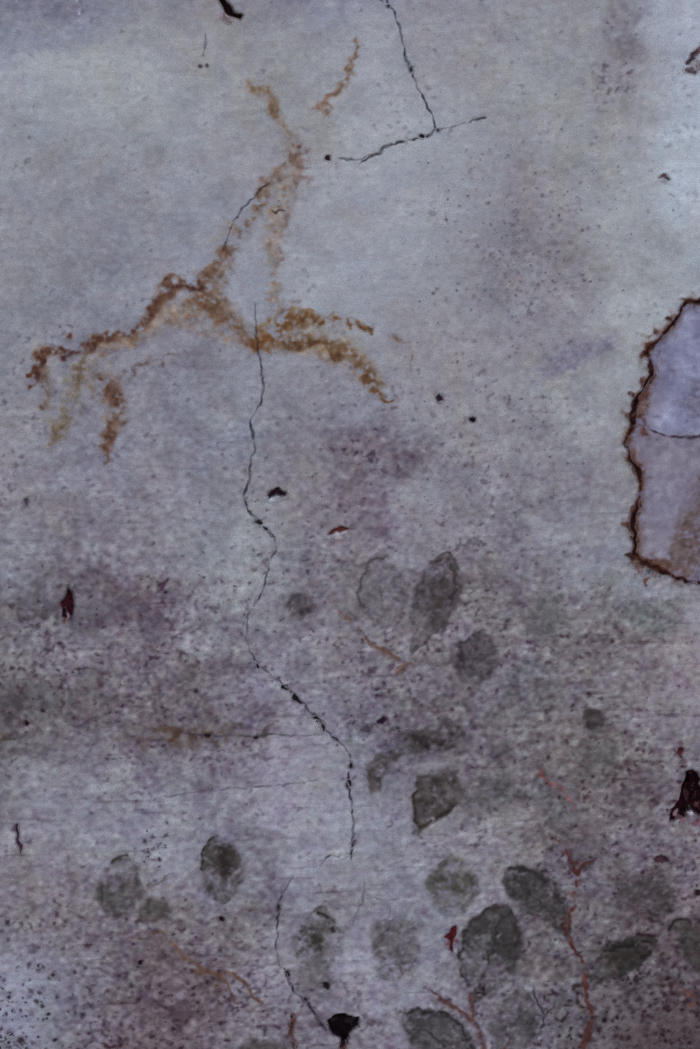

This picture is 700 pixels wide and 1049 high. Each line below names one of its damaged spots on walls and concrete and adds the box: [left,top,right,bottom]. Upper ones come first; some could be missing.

rust [313,35,363,119]
crack [324,0,487,165]
rust [21,71,415,467]
crack [222,181,270,252]
peeling [618,290,700,595]
crack [157,301,420,1049]
leakage [133,819,175,902]
leakage [0,960,79,1049]
leakage [89,913,277,1049]